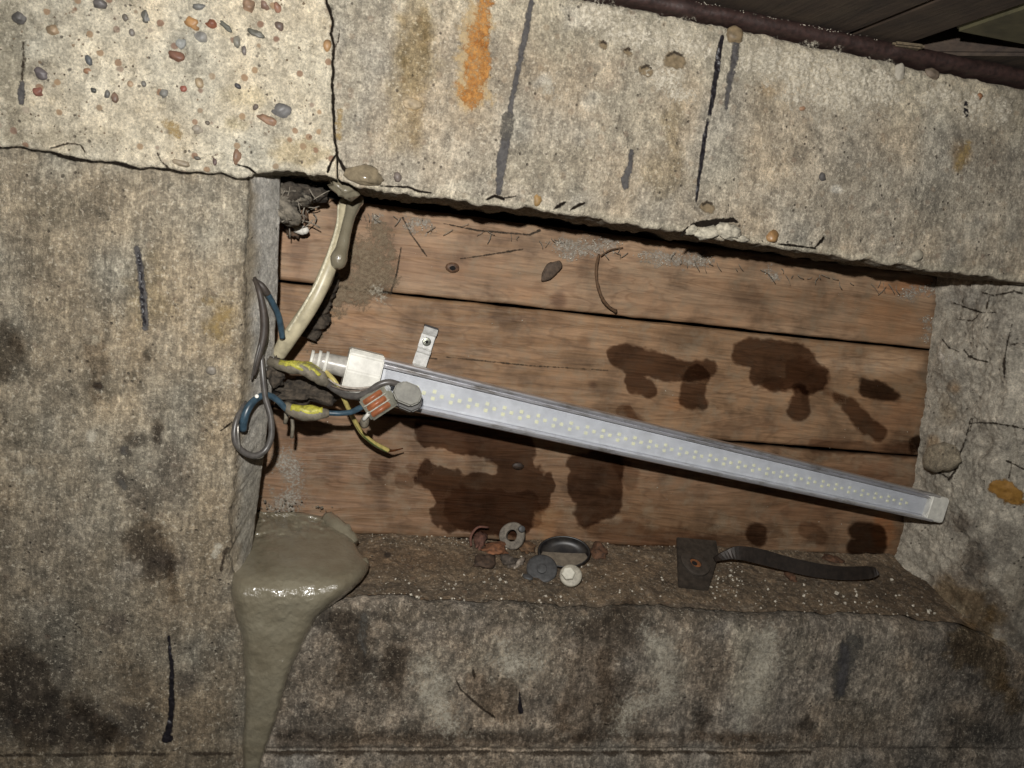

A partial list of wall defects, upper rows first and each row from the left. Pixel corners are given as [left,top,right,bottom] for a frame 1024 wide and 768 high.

crack [325,0,346,173]
corrosion [455,0,494,110]
crack [0,142,257,179]
crack [942,290,1024,378]
damp [415,417,555,536]
damp [567,450,623,527]
damp [607,344,716,409]
damp [732,338,828,420]
damp [835,379,899,441]
crack [938,418,1024,481]